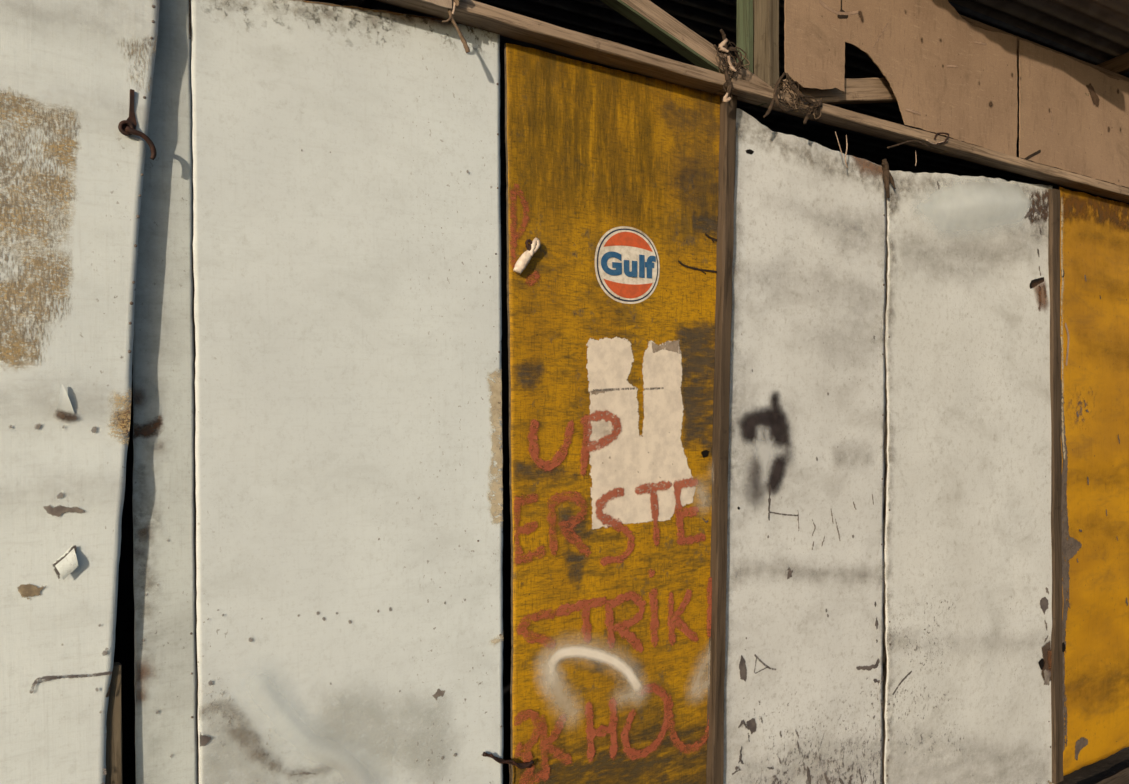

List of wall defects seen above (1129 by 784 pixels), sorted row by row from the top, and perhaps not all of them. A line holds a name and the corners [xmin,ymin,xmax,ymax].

peeling [0,93,76,365]
corrosion [109,394,162,442]